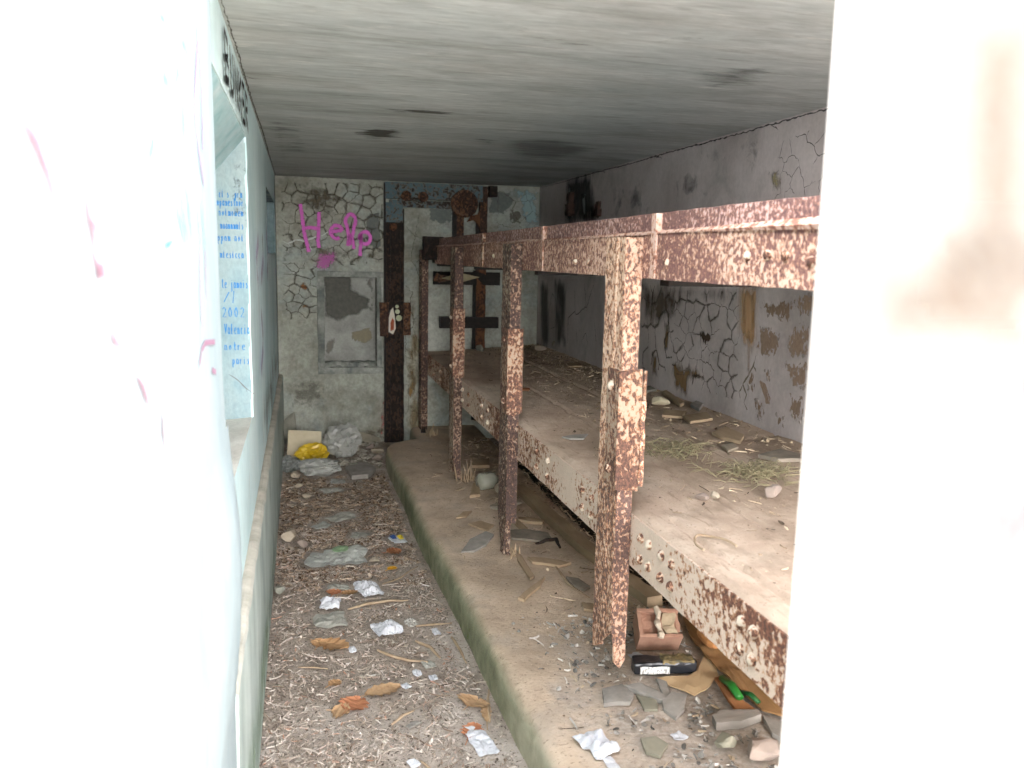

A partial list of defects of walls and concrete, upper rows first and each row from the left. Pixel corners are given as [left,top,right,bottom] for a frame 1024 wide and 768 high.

crack [221,0,422,361]
crack [497,108,828,229]
rust [674,364,697,394]
crack [641,285,756,409]
rust [741,291,756,342]